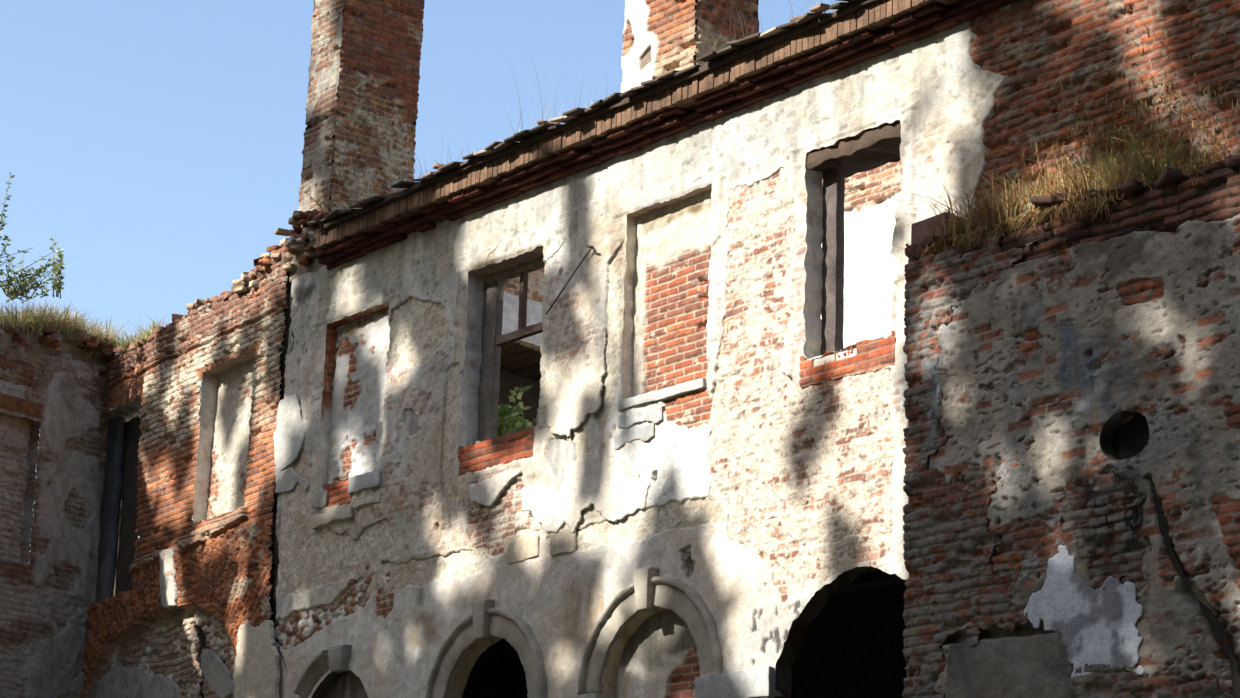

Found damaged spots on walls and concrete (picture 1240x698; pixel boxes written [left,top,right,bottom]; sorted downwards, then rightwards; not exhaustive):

spalling [0,327,62,388]
spalling [201,168,896,698]
spalling [902,0,1240,698]
peeling [95,666,181,698]
crack [1150,478,1240,698]